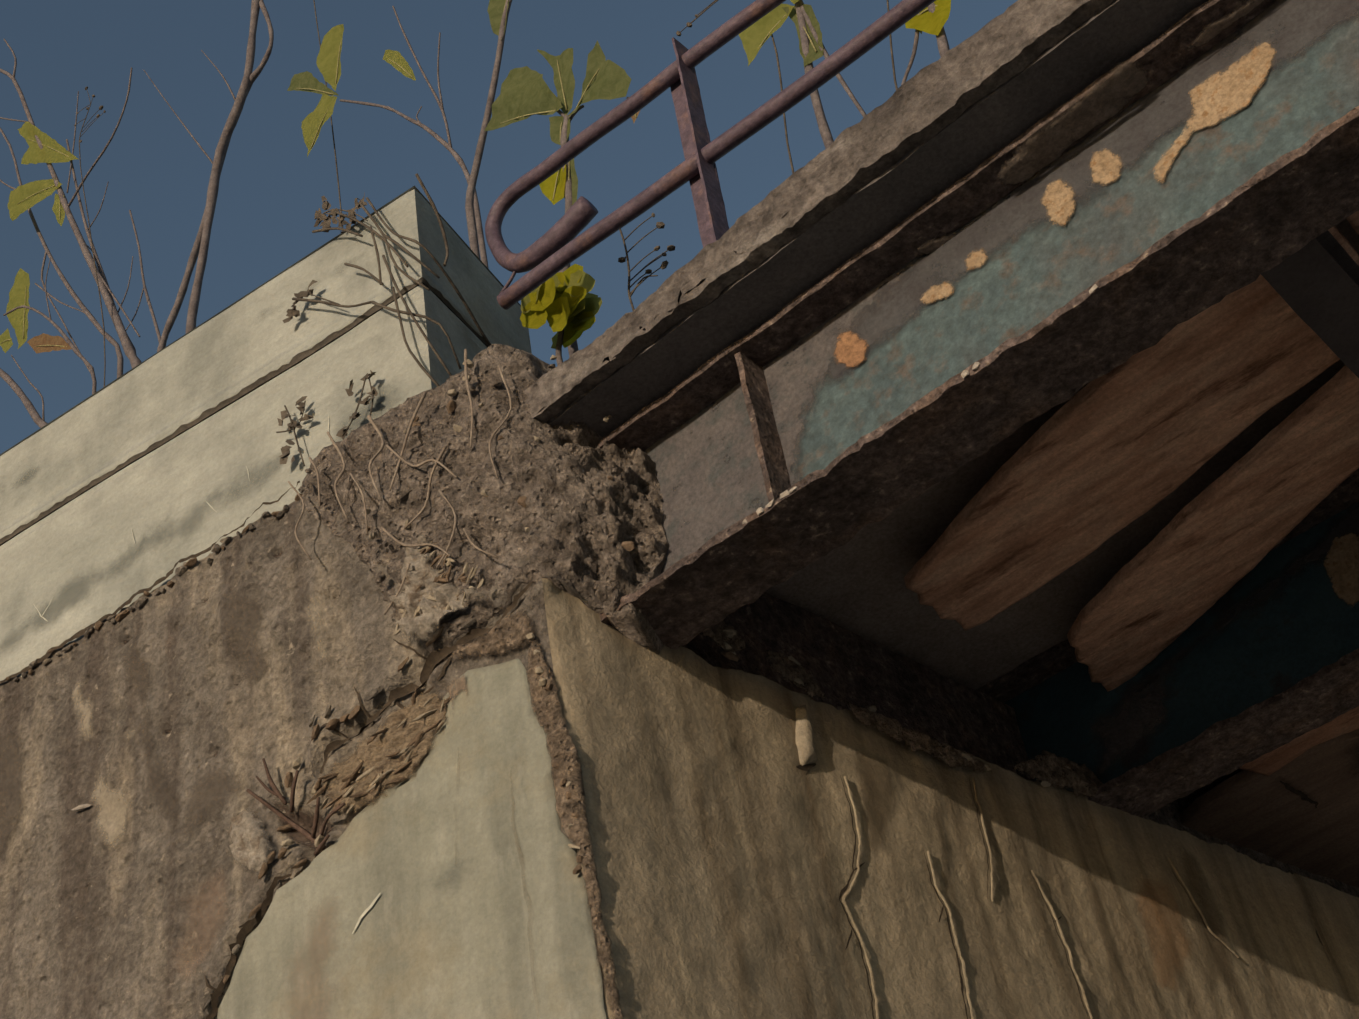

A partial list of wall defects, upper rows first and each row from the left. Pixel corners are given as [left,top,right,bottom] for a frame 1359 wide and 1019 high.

peeling [1154,42,1275,181]
spalling [246,686,449,879]
spalling [448,609,623,1019]
crack [839,776,879,1019]